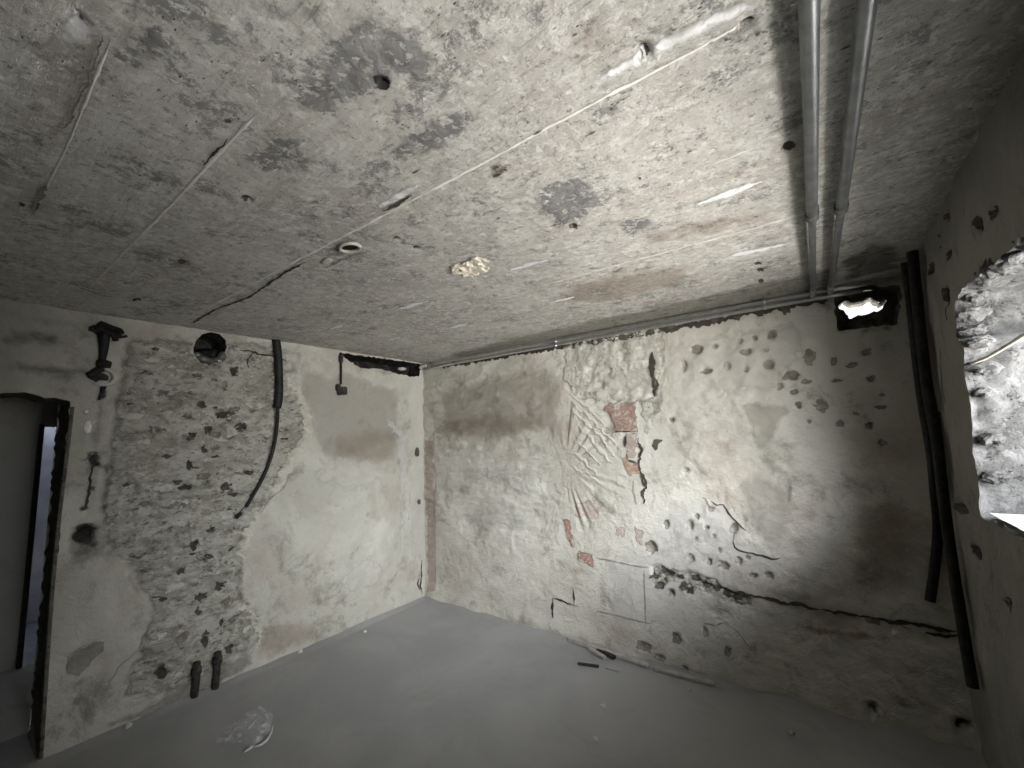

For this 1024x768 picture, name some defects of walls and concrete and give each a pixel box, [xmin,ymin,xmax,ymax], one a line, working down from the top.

leakage [298,20,436,115]
leakage [538,180,590,225]
crack [193,251,369,323]
spalling [941,237,1024,348]
spalling [738,330,777,369]
spalling [777,349,829,424]
spalling [965,361,1005,399]
crack [624,436,647,504]
flaking render [104,339,313,695]
flaking render [563,500,600,567]
crack [703,497,780,560]
crack [718,584,958,638]